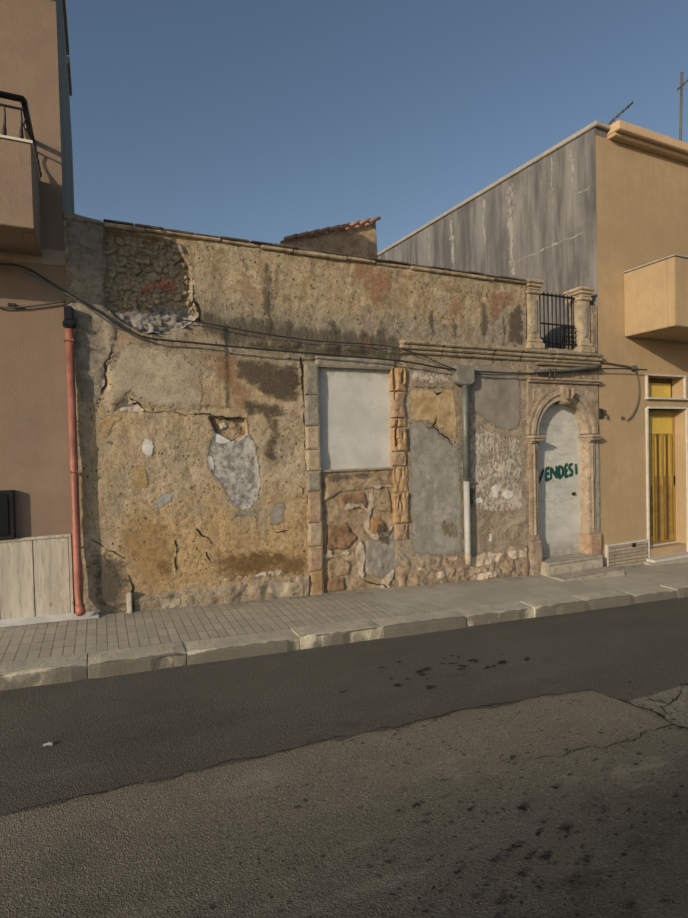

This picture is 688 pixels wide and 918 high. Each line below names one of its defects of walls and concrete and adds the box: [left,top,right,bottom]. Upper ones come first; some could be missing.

spalling [102,230,197,335]
peeling [104,345,202,412]
crack [94,346,242,420]
damp [202,262,401,461]
peeling [410,371,457,438]
peeling [131,438,154,488]
spalling [207,416,261,509]
peeling [469,421,526,532]
damp [92,554,126,608]
damp [217,553,304,581]
peeling [355,540,365,578]
spalling [380,533,529,588]